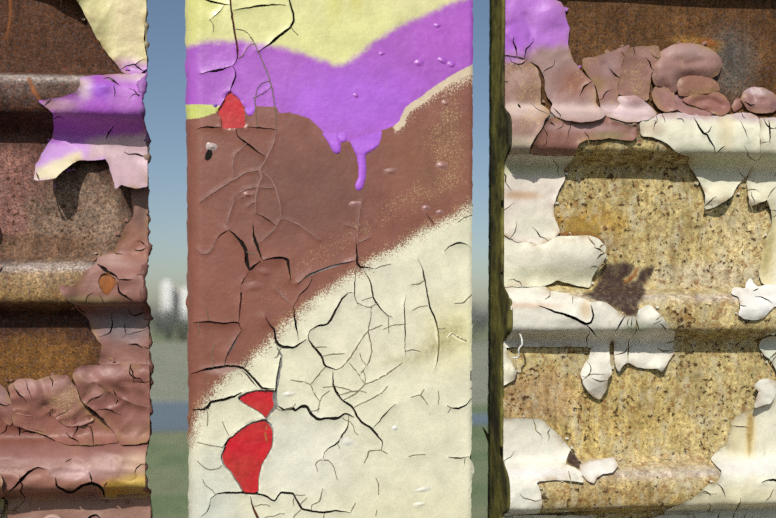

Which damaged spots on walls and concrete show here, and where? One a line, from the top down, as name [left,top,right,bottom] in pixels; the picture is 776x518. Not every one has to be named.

peeling [218,89,245,129]
peeling [0,0,151,518]
crack [191,0,472,518]
corrosion [560,220,601,240]
peeling [503,0,776,399]
crack [540,306,597,337]
peeling [221,390,274,493]
peeling [503,415,618,518]
peeling [651,379,776,518]